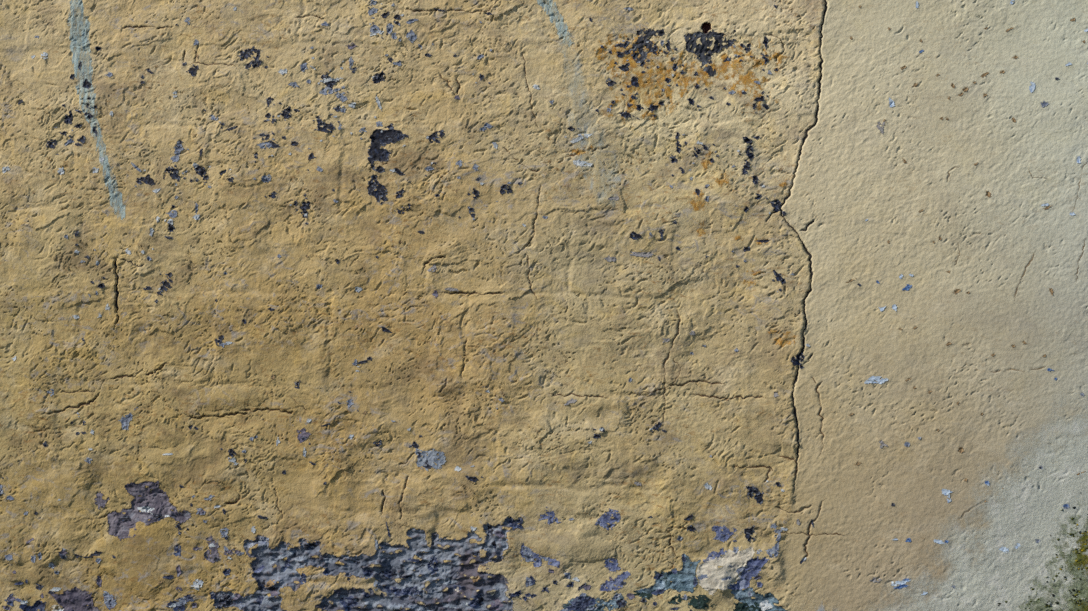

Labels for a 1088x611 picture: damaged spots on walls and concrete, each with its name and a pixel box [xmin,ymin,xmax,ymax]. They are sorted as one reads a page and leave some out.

peeling [240,42,411,214]
peeling [290,194,310,225]
crack [114,257,144,322]
crack [734,0,842,557]
crack [549,312,764,422]
peeling [3,548,121,611]
peeling [94,480,814,611]
peeling [869,577,911,589]
water stain [891,418,1088,611]